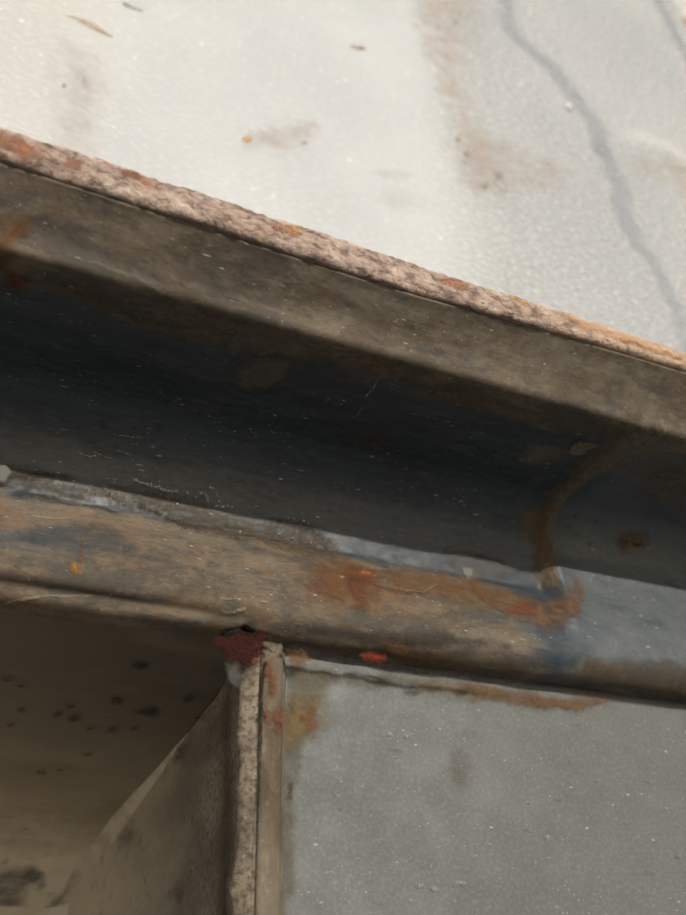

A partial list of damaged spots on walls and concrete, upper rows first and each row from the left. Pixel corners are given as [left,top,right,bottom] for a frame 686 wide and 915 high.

rust [0,133,45,163]
rust [415,683,608,710]